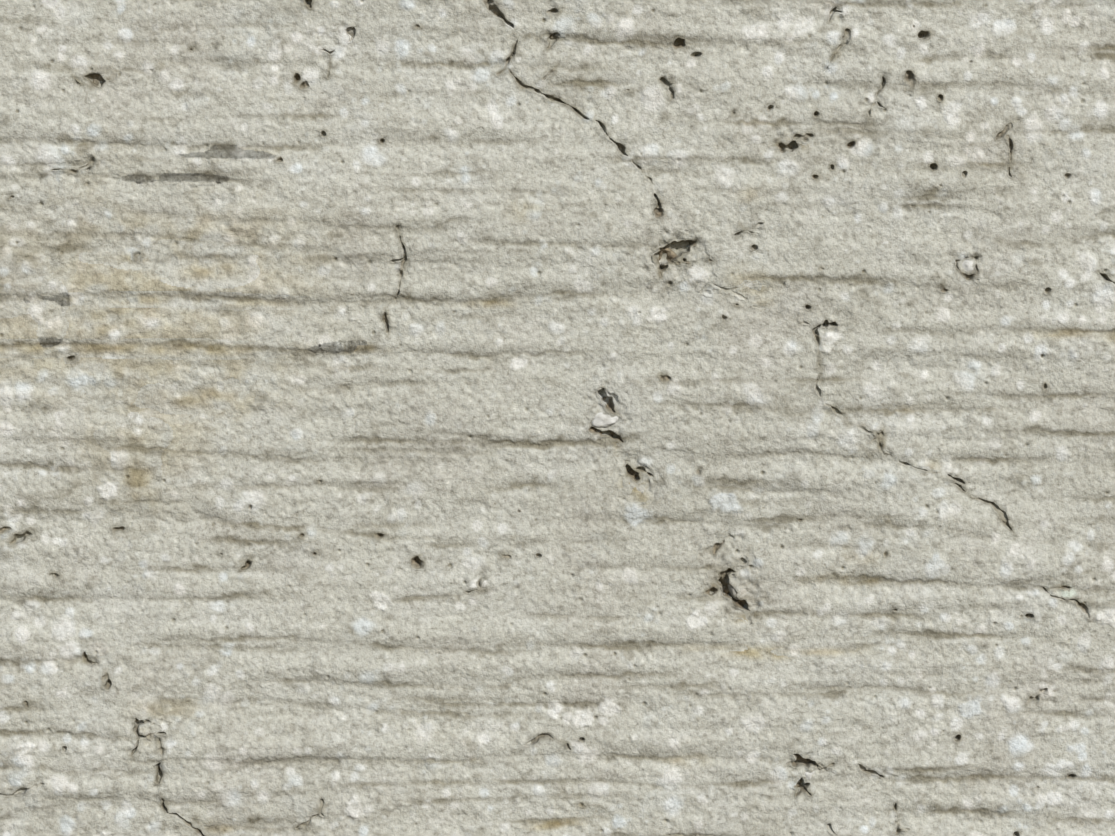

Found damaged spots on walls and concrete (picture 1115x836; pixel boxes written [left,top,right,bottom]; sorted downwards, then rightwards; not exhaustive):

crack [480,0,663,208]
crack [658,76,676,101]
crack [709,280,1017,537]
crack [129,716,208,836]
crack [816,761,912,836]